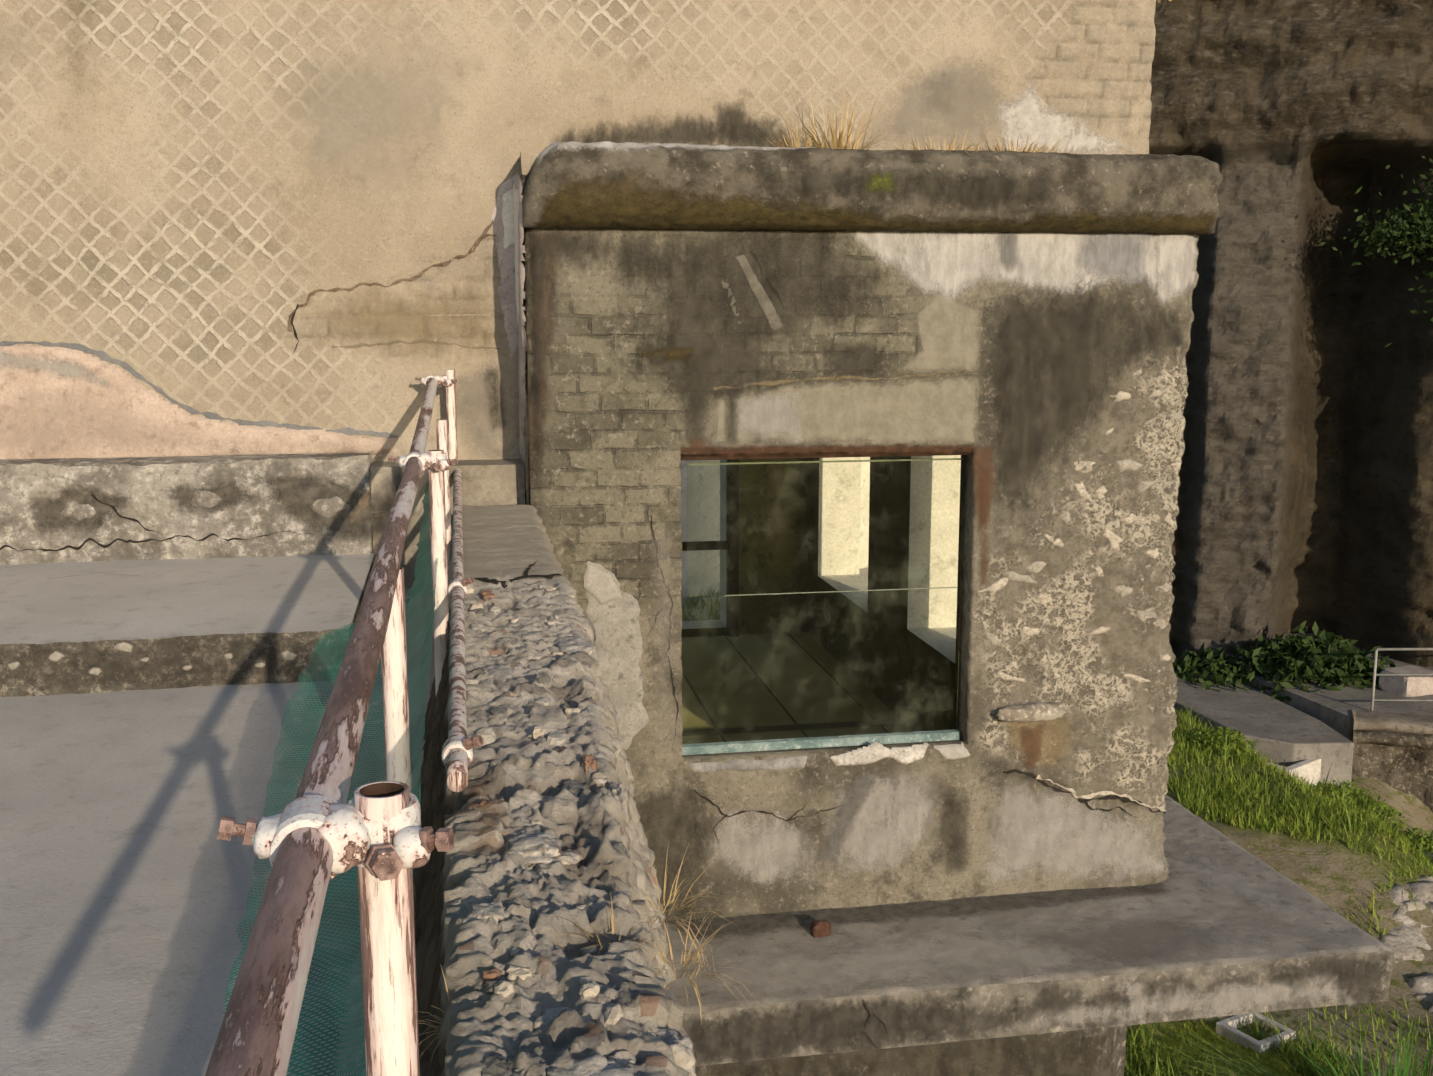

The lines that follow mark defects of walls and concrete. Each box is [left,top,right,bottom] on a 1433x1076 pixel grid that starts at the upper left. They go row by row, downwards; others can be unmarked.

water stain [537,108,808,159]
crack [287,220,496,354]
flaking render [332,172,527,462]
flaking render [0,344,397,459]
water stain [993,288,1183,504]
crack [466,560,563,588]
spalling [688,756,807,773]
spalling [830,742,970,766]
crack [1003,769,1166,818]